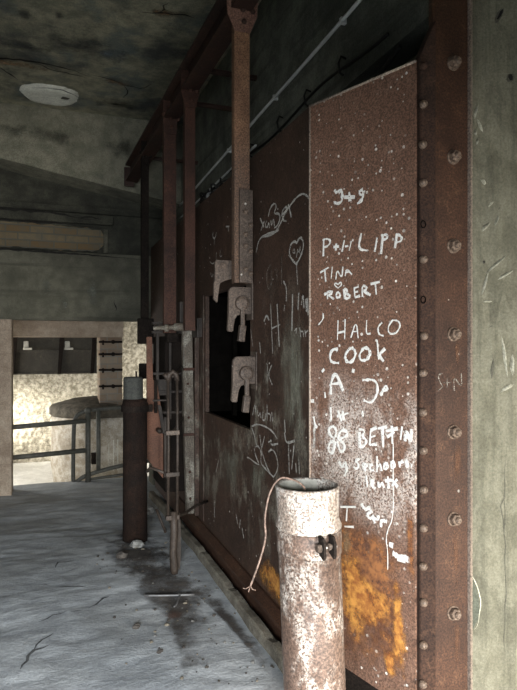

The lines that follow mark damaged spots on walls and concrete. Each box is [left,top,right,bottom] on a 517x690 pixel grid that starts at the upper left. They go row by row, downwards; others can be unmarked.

corrosion [260,566,280,598]
corrosion [341,525,405,675]
crack [20,612,64,669]